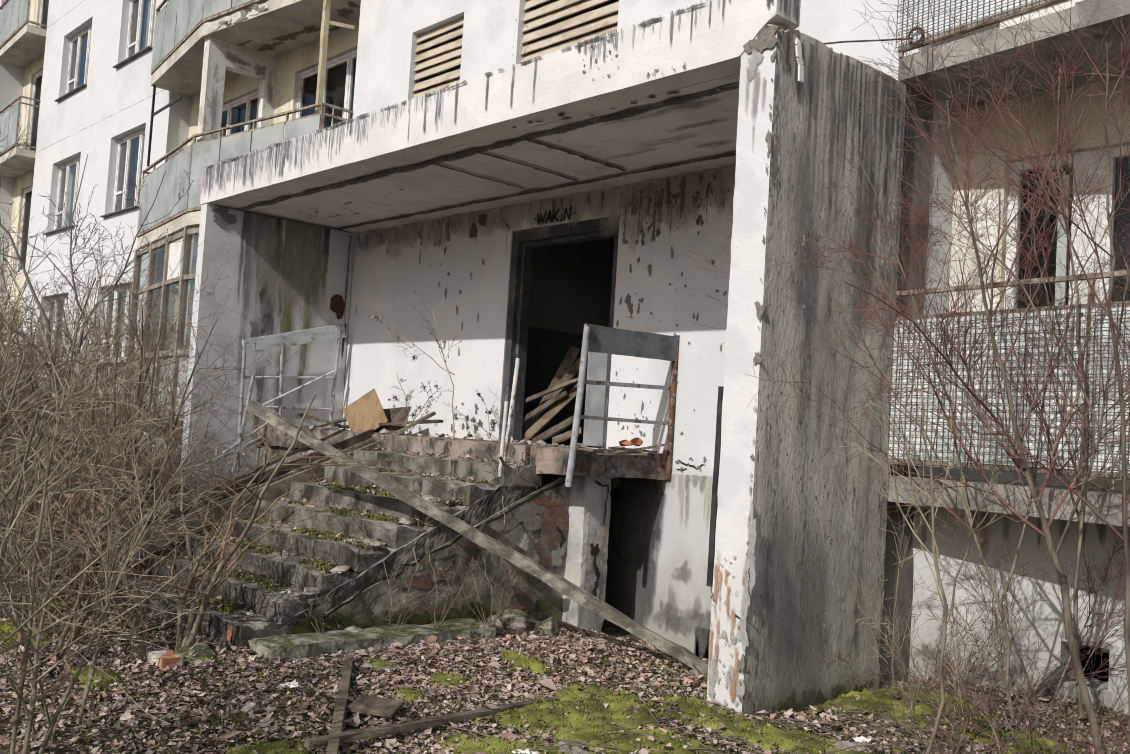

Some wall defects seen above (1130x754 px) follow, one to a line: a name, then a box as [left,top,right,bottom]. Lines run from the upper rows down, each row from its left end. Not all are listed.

spalling [209,4,269,32]
leakage [225,1,360,103]
leakage [577,0,730,80]
spalling [765,104,776,174]
rust [330,235,351,358]
leakage [201,66,765,436]
peeling [616,293,660,327]
spalling [755,301,768,328]
leakage [767,0,910,439]
spalling [514,493,569,571]
leakage [605,478,710,652]
peeling [707,437,766,711]